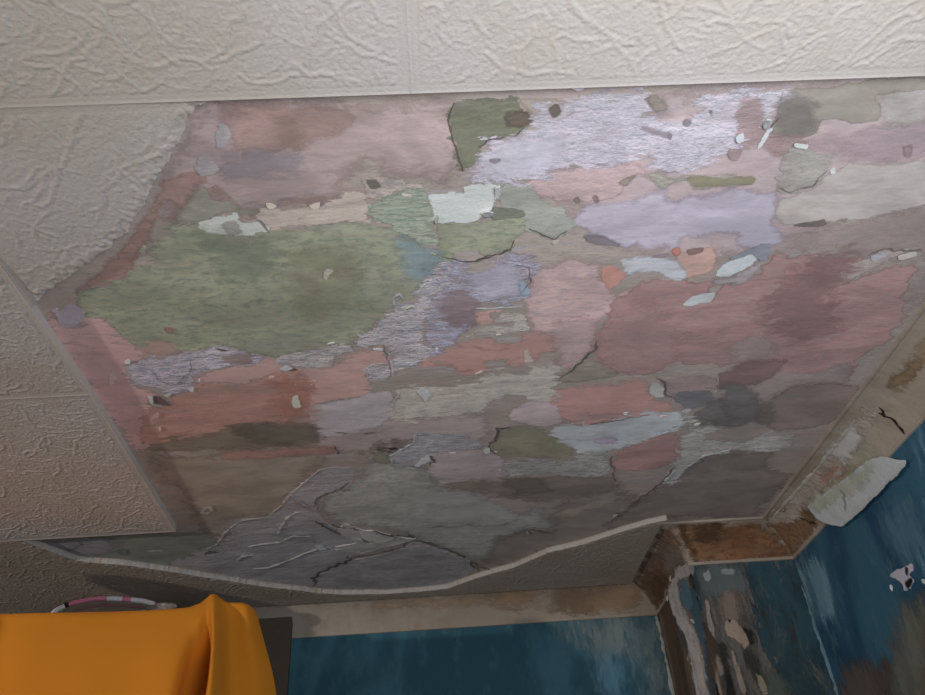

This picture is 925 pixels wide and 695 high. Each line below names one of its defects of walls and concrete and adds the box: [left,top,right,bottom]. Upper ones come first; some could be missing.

peeling [24,77,925,595]
damp [888,340,925,392]
crack [879,407,905,434]
crack [396,519,553,571]